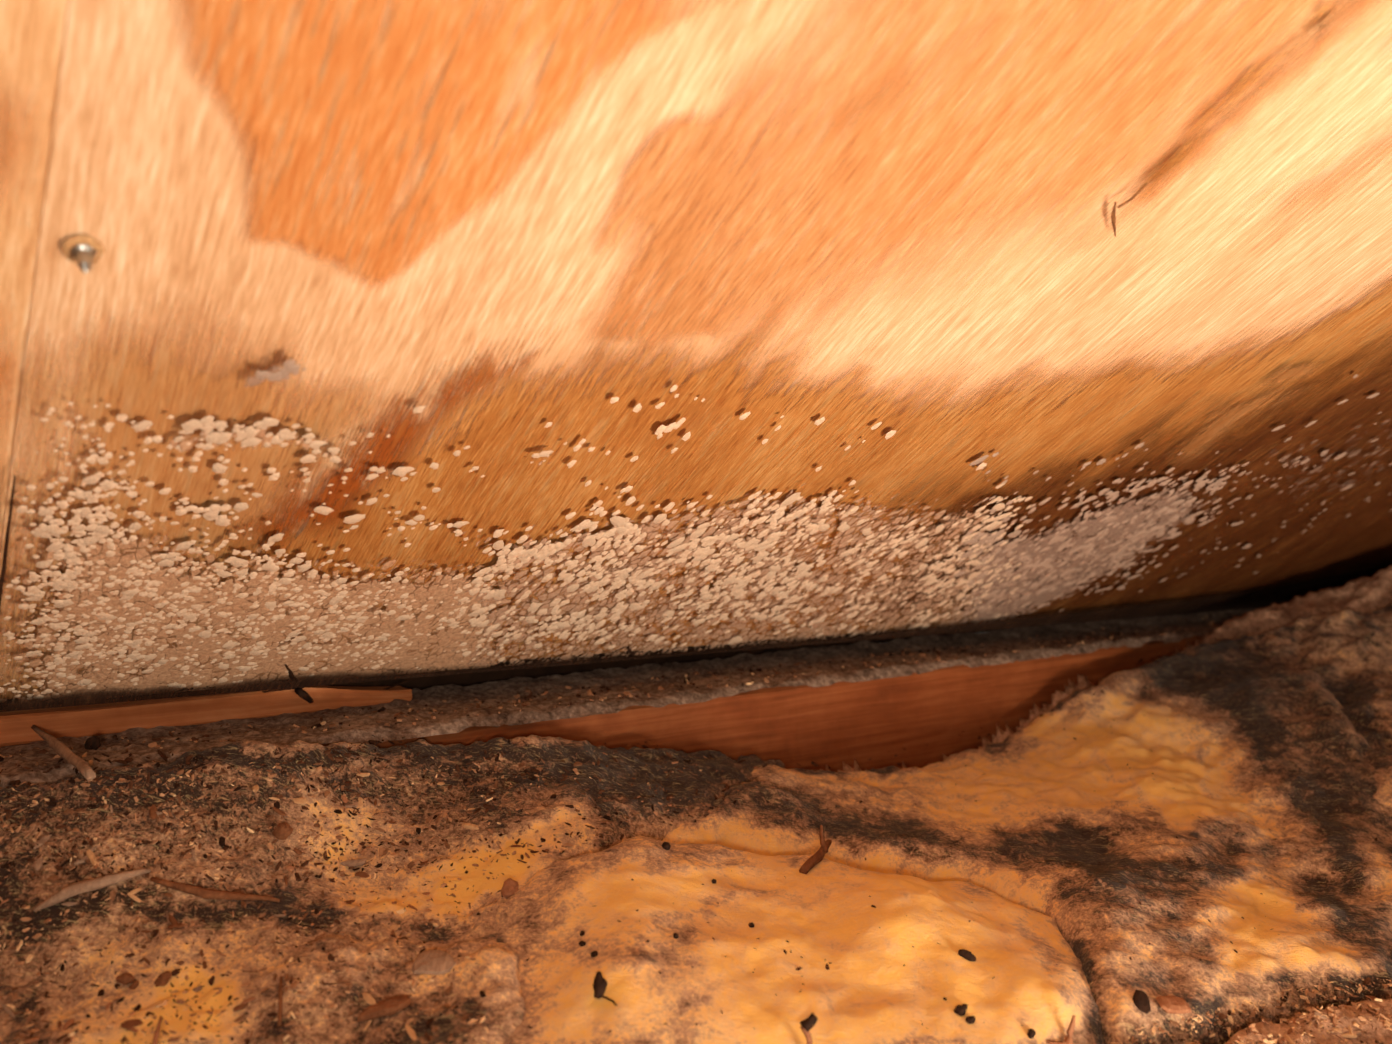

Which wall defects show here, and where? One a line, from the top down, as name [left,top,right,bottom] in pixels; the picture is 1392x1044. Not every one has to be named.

water stain [0,0,1392,712]